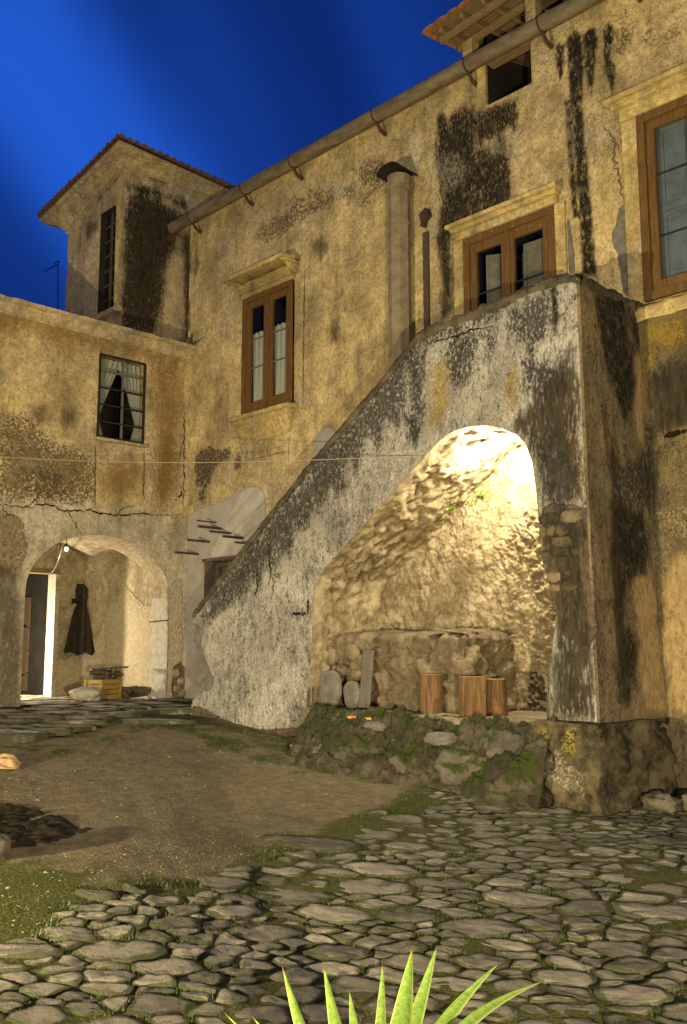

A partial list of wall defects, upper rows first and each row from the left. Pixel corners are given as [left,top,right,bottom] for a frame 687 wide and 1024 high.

damp [556,24,615,275]
crack [599,124,624,199]
damp [122,185,198,335]
crack [0,411,185,527]
damp [202,101,594,721]
crack [426,326,492,348]
damp [595,296,687,705]